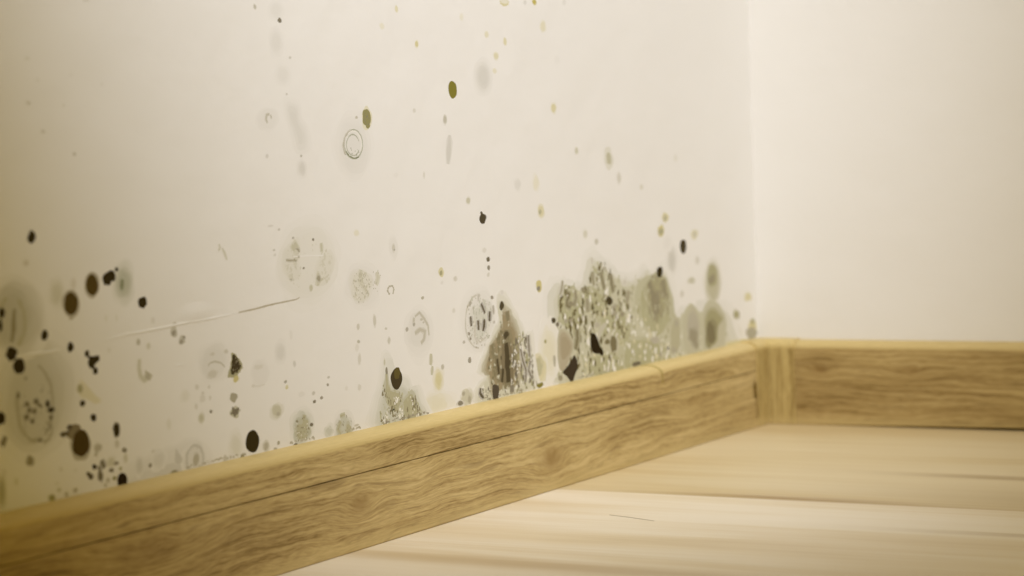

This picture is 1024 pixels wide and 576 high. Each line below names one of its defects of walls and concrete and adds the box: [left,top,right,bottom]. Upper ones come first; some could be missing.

crack [239,297,300,313]
mould [0,212,757,513]